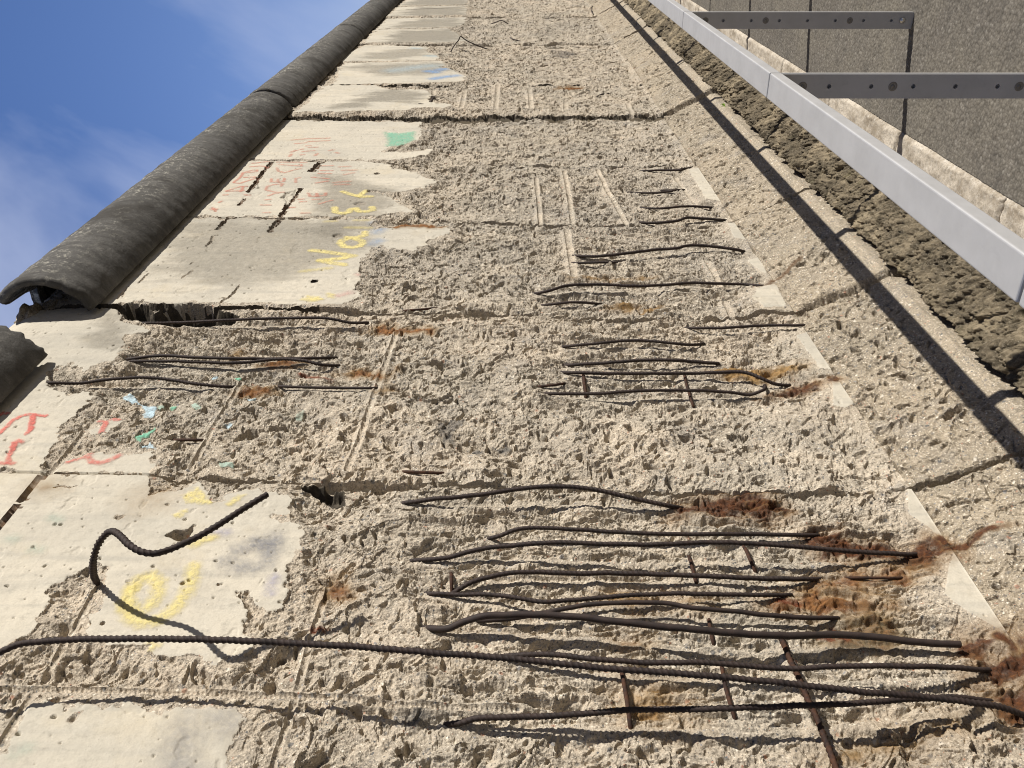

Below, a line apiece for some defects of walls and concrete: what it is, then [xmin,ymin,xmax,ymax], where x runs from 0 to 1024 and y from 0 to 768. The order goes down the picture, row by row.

spalling [0,0,910,530]
rust [717,365,798,385]
rust [769,377,840,398]
rust [676,492,793,526]
spalling [0,477,1024,768]
rust [768,525,1003,651]
rust [957,632,1024,726]